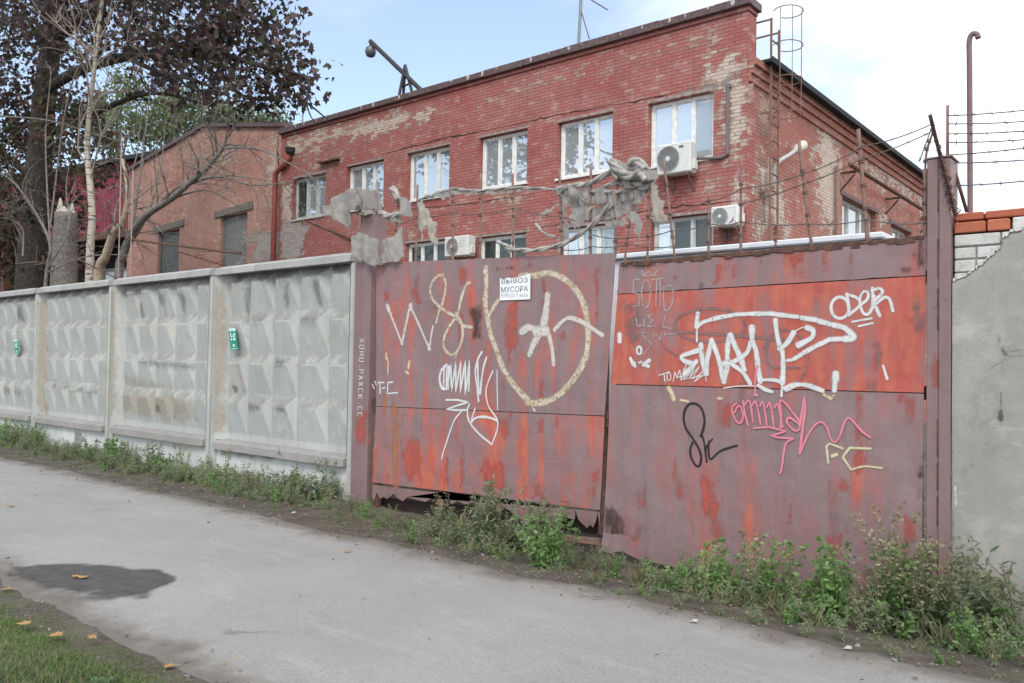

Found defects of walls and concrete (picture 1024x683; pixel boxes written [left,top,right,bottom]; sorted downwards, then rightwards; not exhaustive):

peeling [809,128,923,236]
flaking render [953,227,1023,281]